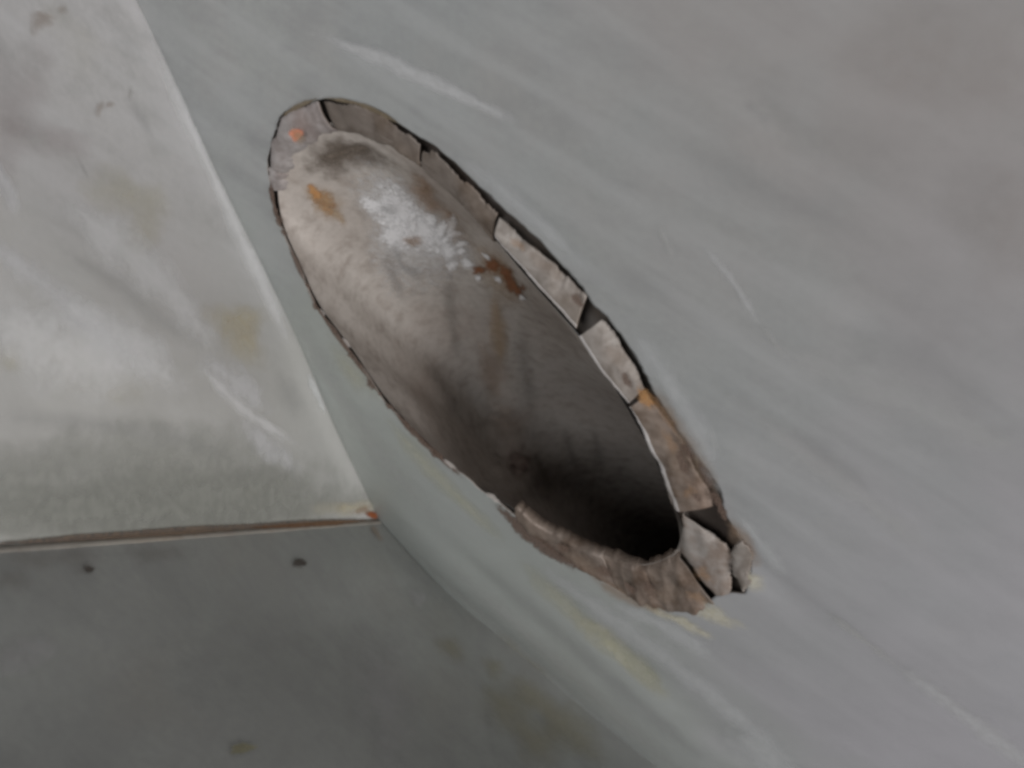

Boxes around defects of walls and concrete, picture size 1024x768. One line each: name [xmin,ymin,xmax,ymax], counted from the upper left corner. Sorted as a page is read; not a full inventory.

corrosion [307,185,335,215]
peeling [358,172,474,287]
corrosion [473,253,526,301]